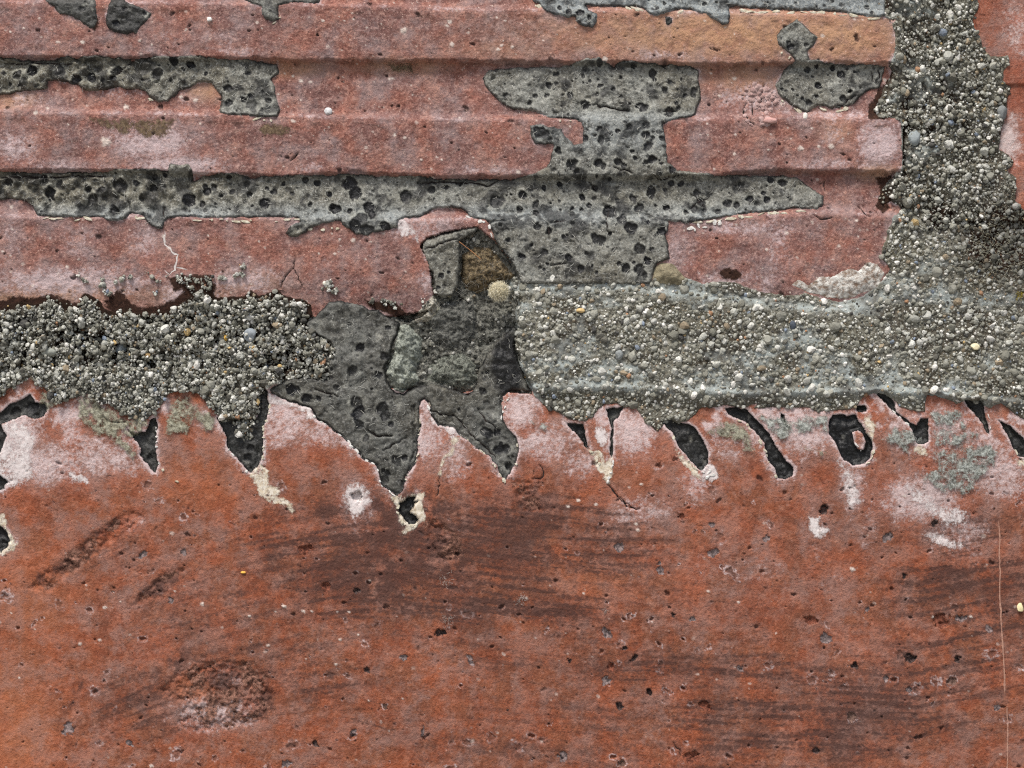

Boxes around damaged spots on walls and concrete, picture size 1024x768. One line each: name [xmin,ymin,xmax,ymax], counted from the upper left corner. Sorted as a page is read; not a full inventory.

peeling [45,0,151,35]
peeling [533,0,885,127]
peeling [0,55,824,297]
crack [163,235,185,275]
damp [0,420,35,491]
peeling [0,394,48,452]
peeling [217,300,532,559]
peeling [663,420,715,479]
peeling [725,407,793,479]
peeling [828,405,875,465]
peeling [965,400,1024,457]
damp [906,483,967,548]